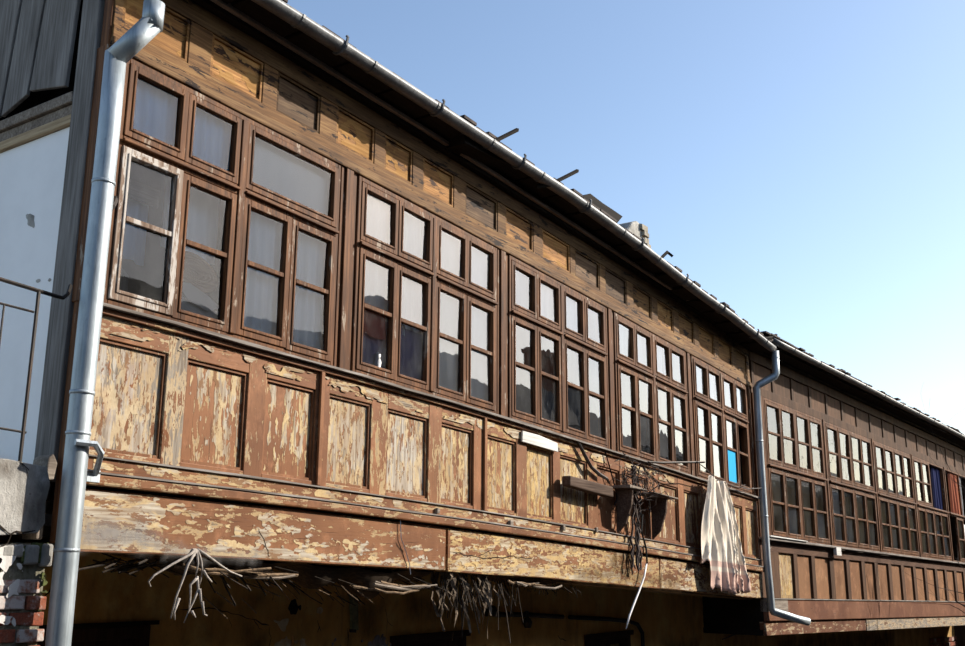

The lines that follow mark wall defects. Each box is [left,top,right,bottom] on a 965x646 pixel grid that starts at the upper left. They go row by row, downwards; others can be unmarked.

peeling [90,326,162,455]
peeling [174,336,214,352]
peeling [186,365,241,465]
peeling [226,350,424,511]
peeling [80,407,762,598]
peeling [0,526,43,598]
peeling [0,615,16,627]